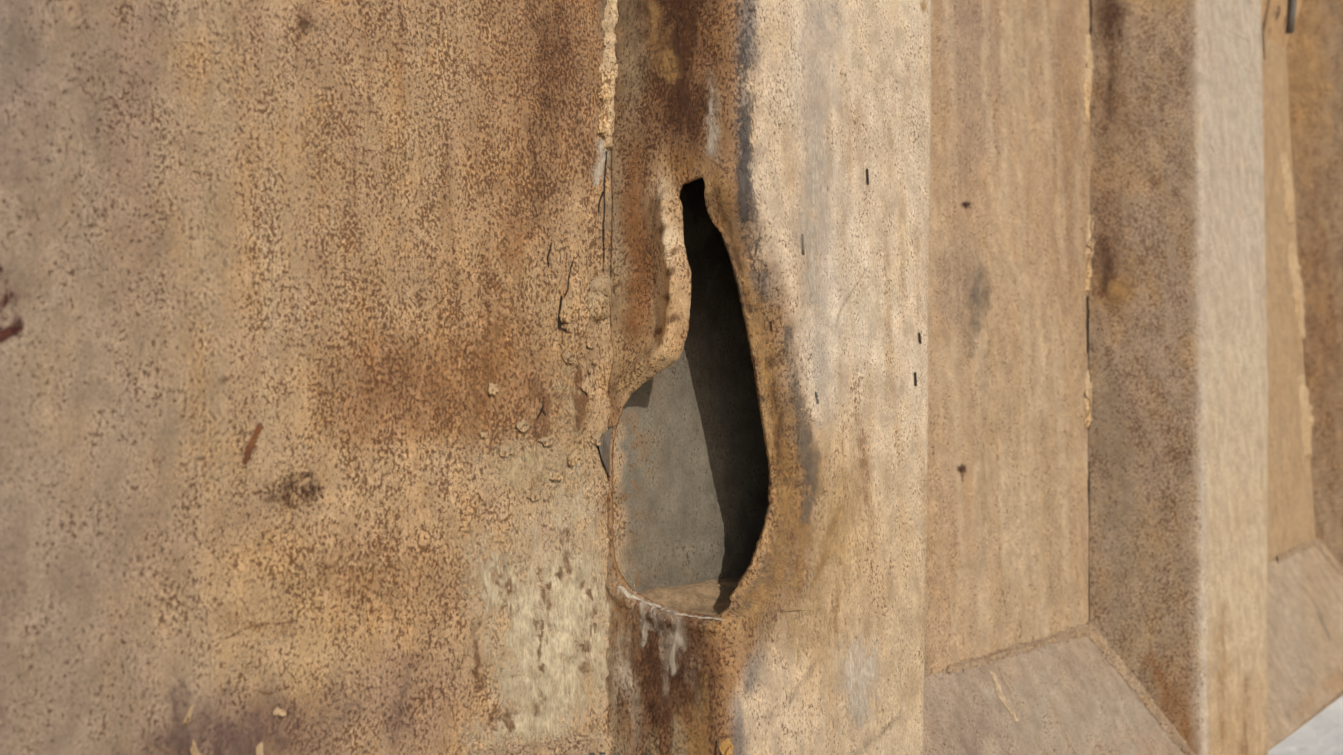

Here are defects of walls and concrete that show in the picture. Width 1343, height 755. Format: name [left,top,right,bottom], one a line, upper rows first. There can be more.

corrosion [644,0,718,155]
corrosion [736,0,766,301]
corrosion [0,267,23,343]
corrosion [639,601,708,755]